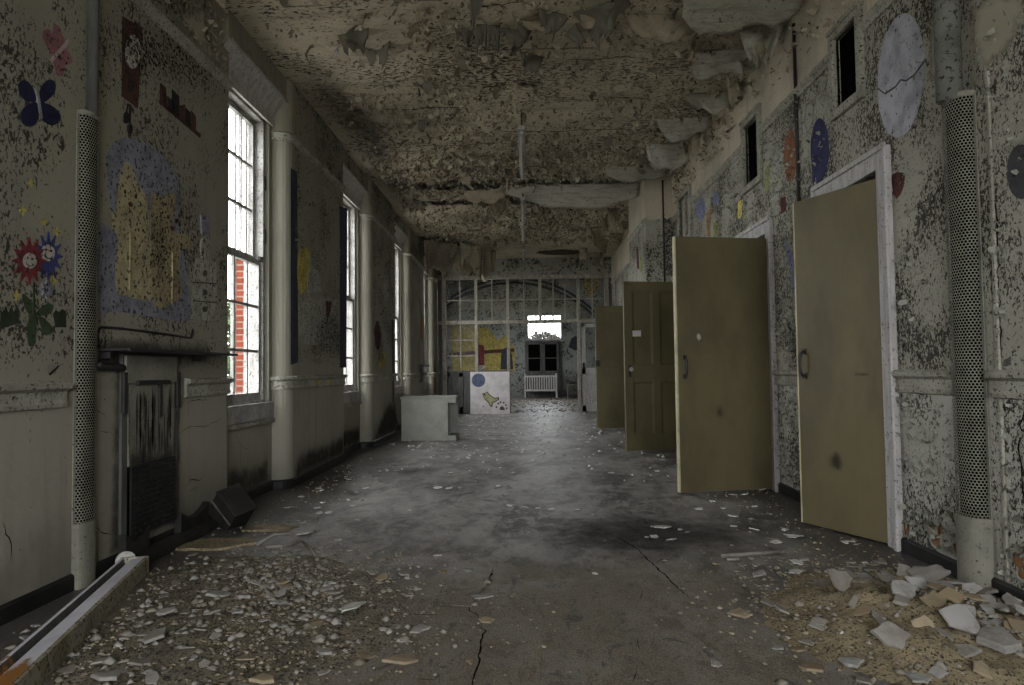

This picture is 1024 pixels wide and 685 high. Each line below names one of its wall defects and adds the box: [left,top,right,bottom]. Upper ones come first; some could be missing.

peeling [248,0,835,327]
peeling [690,74,858,367]
peeling [894,230,940,327]
peeling [988,246,1019,367]
leakage [128,387,177,460]
crack [620,538,689,598]
peeling [895,394,957,556]
spalling [997,462,1024,583]
crack [417,586,487,685]